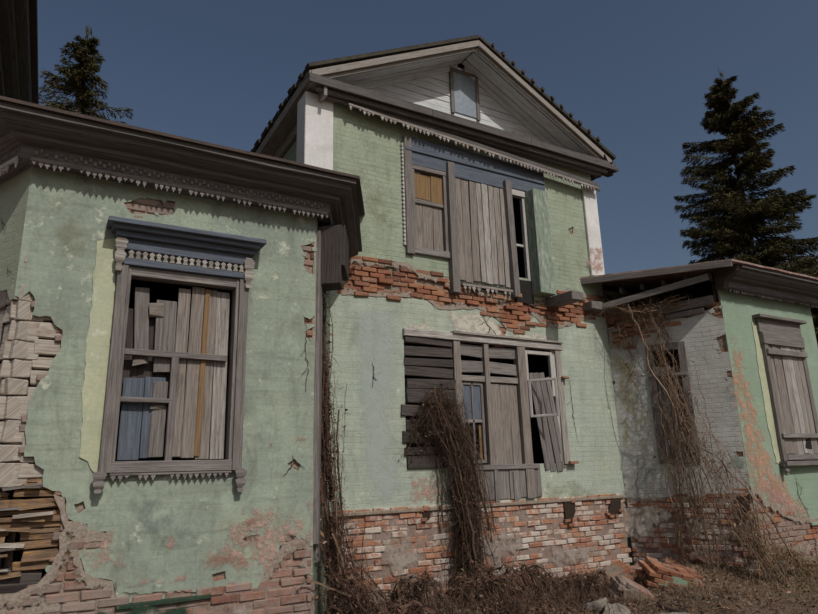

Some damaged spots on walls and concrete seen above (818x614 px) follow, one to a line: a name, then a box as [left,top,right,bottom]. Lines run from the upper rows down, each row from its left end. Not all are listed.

spalling [124,196,175,218]
peeling [451,312,547,340]
spalling [608,314,681,350]
damp [733,351,801,511]
spalling [0,491,116,614]
spalling [208,510,313,596]
spalling [605,482,818,565]